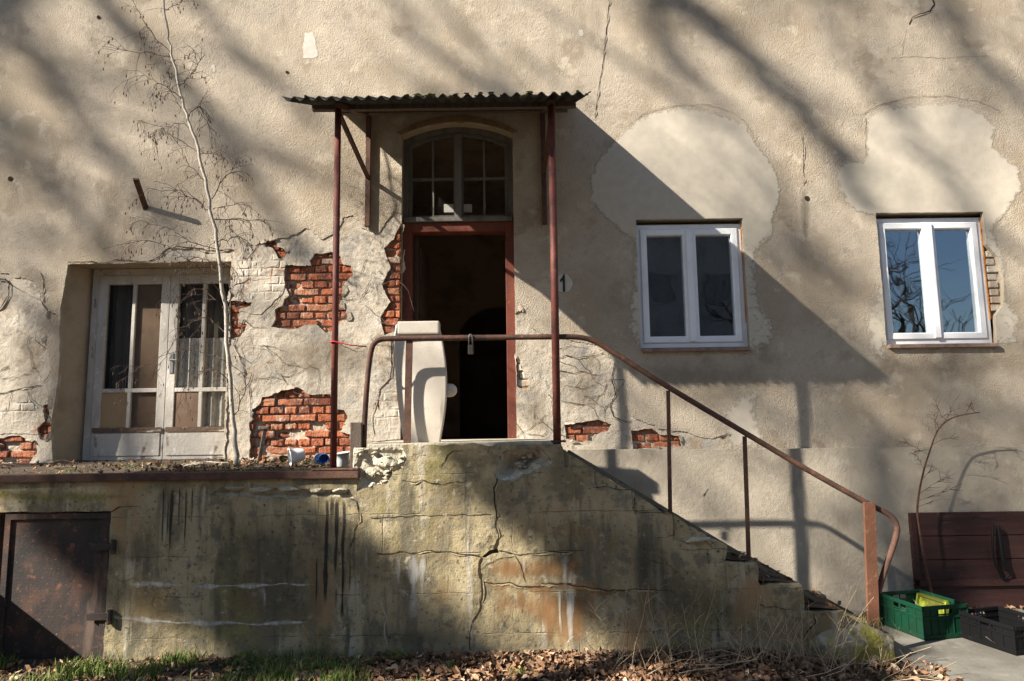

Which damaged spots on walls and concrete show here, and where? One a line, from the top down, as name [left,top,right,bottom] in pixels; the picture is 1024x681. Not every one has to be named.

crack [595,0,611,118]
flaking render [984,247,1001,317]
flaking render [0,273,53,464]
flaking render [162,211,407,499]
flaking render [494,305,734,481]
leakage [162,489,201,547]
leakage [316,498,351,615]
leakage [397,559,425,610]
crack [403,450,461,485]
crack [350,477,678,650]
rust [492,562,613,638]
leakage [559,594,574,637]